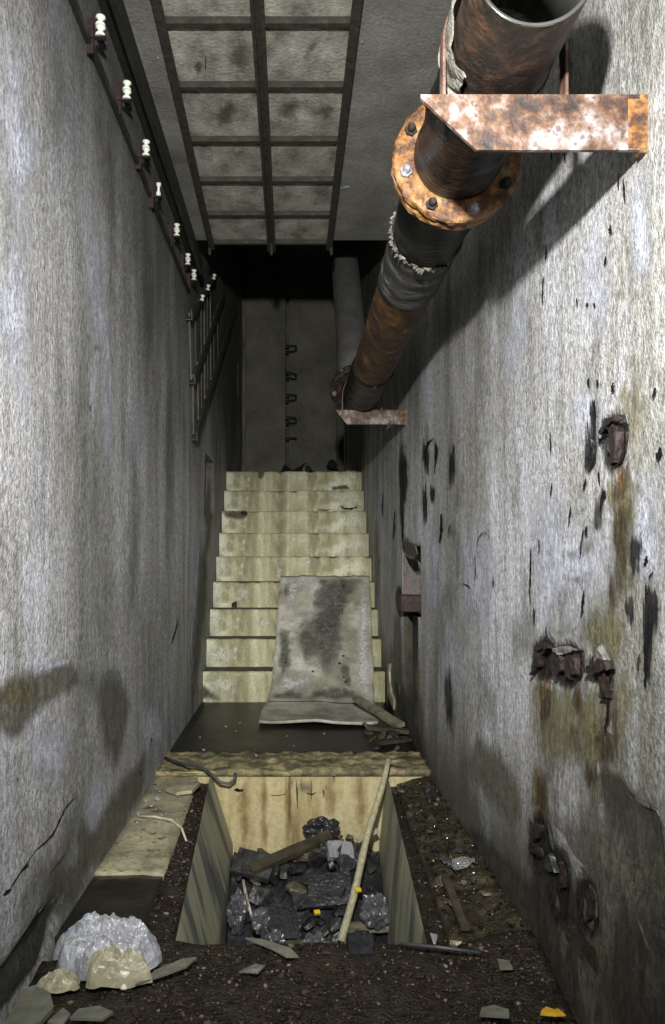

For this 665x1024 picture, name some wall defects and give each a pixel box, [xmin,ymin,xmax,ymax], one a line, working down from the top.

corrosion [586,466,636,651]
crack [3,797,75,895]